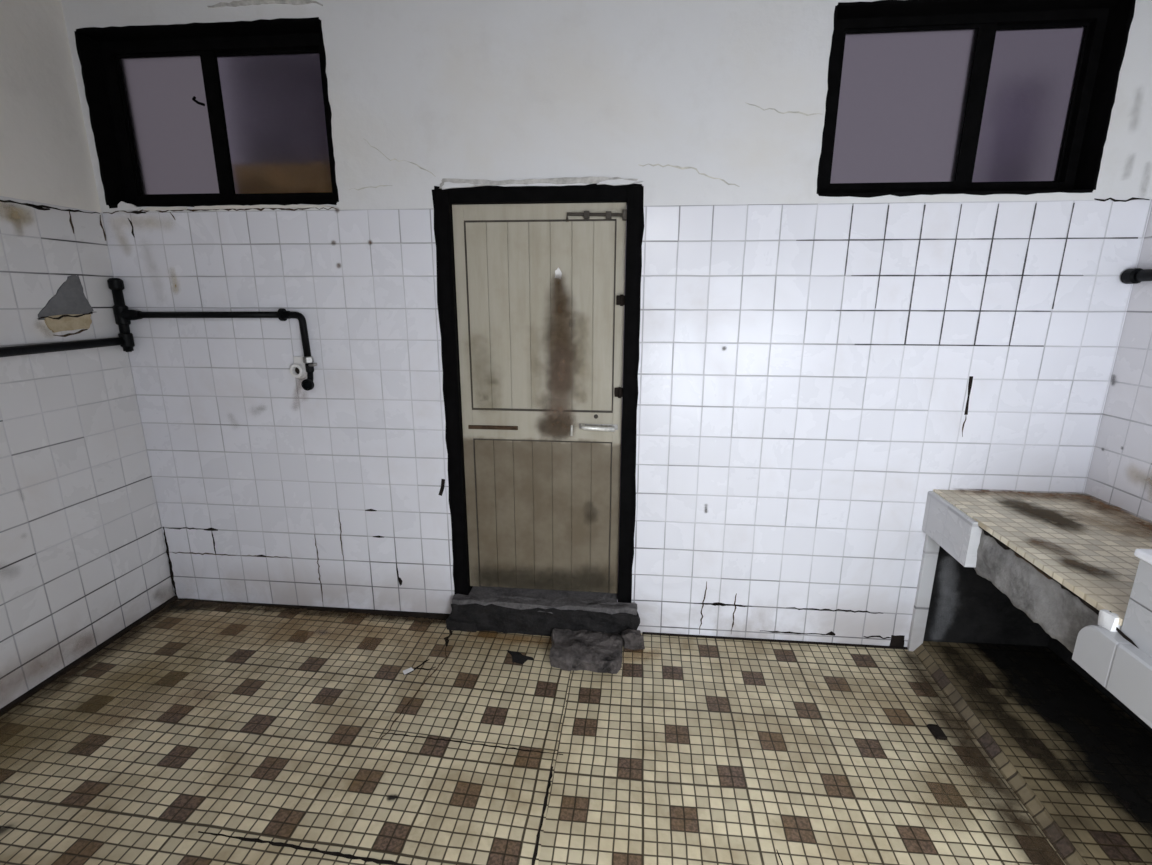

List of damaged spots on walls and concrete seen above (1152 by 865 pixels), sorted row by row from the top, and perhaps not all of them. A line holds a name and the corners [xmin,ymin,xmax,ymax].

peeling [38,275,94,337]
crack [372,630,563,865]
leakage [942,647,1083,791]
crack [198,831,409,865]